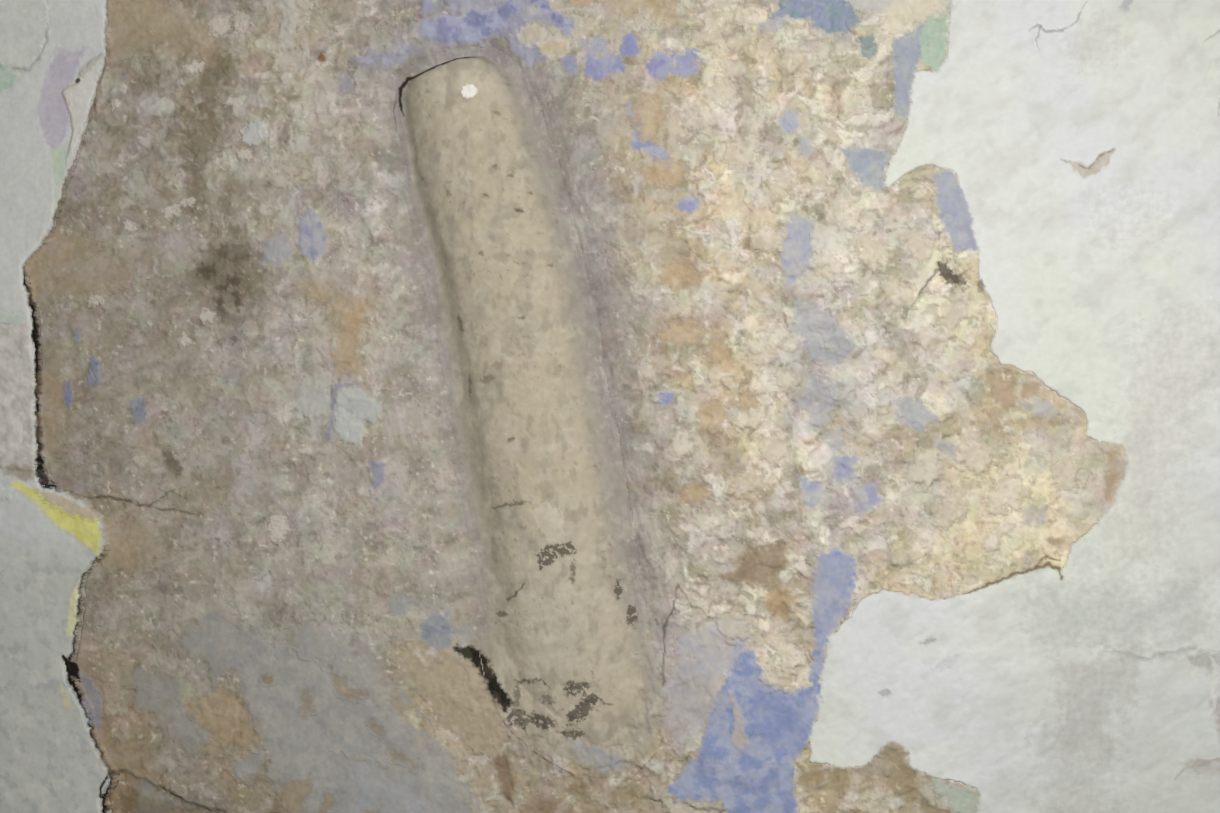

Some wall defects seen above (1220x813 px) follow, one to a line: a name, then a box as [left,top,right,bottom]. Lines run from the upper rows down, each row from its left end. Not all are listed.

spalling [567,0,683,33]
crack [393,57,476,133]
spalling [628,90,674,146]
flaking render [0,0,106,326]
spalling [636,154,689,192]
peeling [1060,147,1117,180]
crack [22,0,201,518]
spalling [0,321,44,483]
peeling [491,499,581,585]
peeling [506,676,561,732]
peeling [559,679,631,777]
spalling [794,739,982,813]